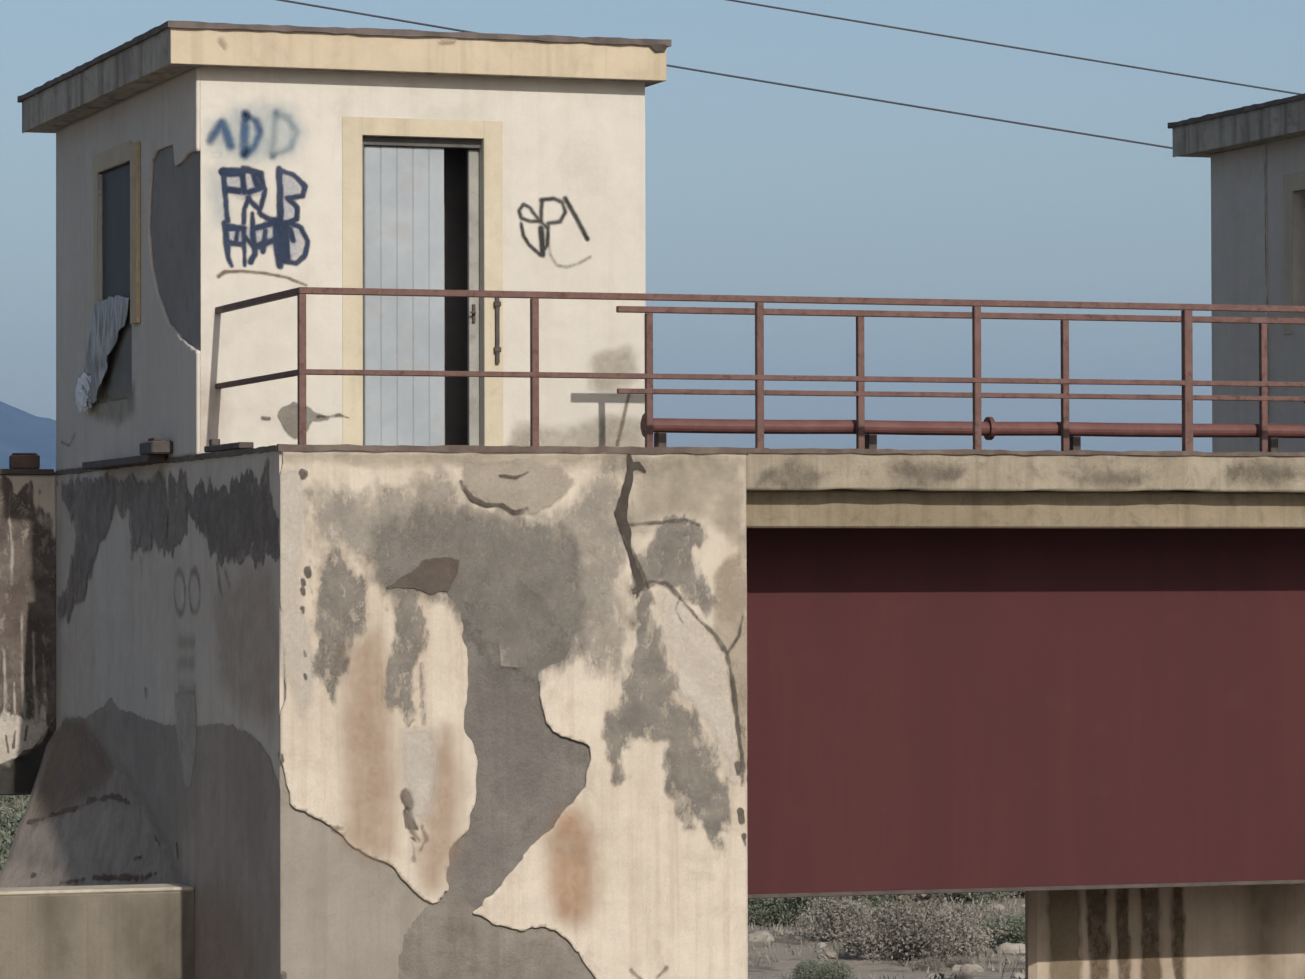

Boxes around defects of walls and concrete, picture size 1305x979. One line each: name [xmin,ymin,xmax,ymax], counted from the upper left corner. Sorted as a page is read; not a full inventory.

peeling [150,146,200,351]
spalling [261,402,348,438]
water stain [0,475,56,735]
peeling [0,574,590,979]
peeling [300,566,311,614]
water stain [313,419,632,819]
peeling [603,515,746,846]
crack [615,454,745,781]
water stain [1049,887,1185,979]